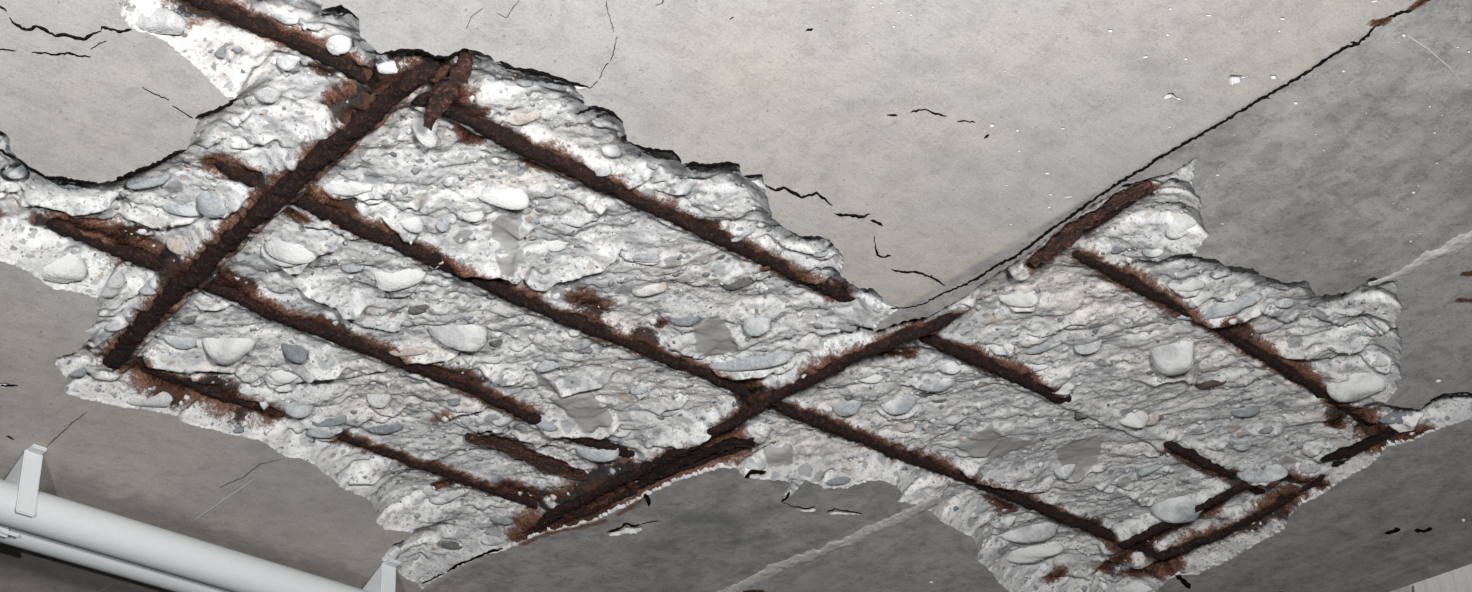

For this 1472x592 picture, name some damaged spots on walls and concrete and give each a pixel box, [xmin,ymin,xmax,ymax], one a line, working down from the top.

crack [0,6,132,57]
rust [160,0,327,52]
crack [322,5,359,20]
crack [378,0,519,60]
spalling [1228,75,1248,85]
rust [1370,17,1392,26]
crack [0,87,237,184]
crack [497,0,1430,309]
spalling [0,0,911,589]
rust [29,49,1331,582]
rust [1023,179,1435,463]
spalling [548,157,1472,592]